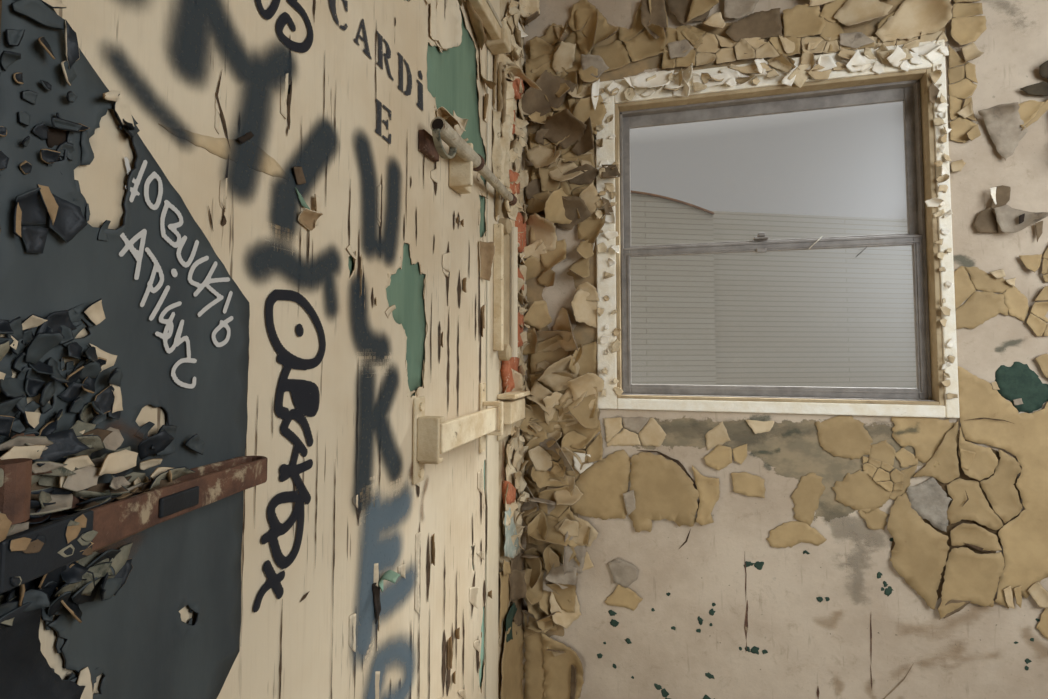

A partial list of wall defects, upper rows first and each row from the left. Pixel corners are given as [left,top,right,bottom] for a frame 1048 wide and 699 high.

peeling [0,0,140,254]
peeling [187,130,254,159]
peeling [259,151,323,231]
peeling [346,245,357,271]
peeling [385,243,427,397]
peeling [427,0,1048,699]
peeling [0,298,205,699]
crack [964,543,992,553]
peeling [372,570,401,624]